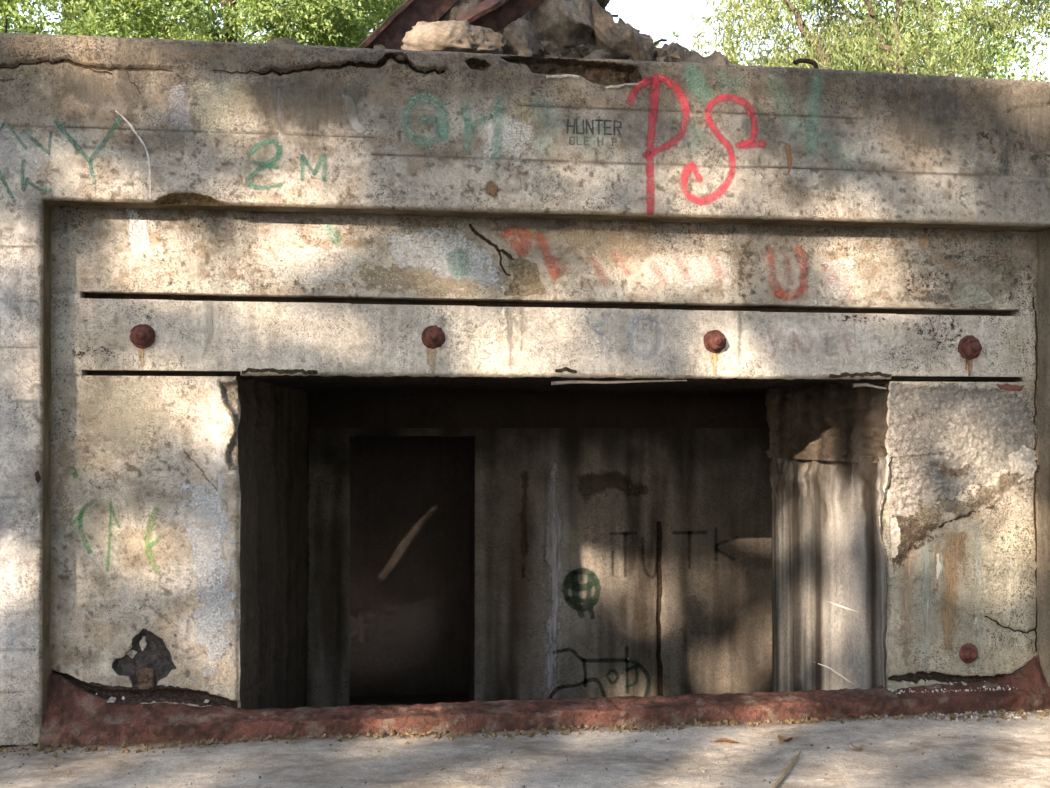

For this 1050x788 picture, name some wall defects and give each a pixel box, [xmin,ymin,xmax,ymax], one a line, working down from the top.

crack [0,59,174,94]
crack [469,224,514,276]
spalling [829,372,1038,571]
crack [888,297,1038,685]
spalling [112,628,176,690]